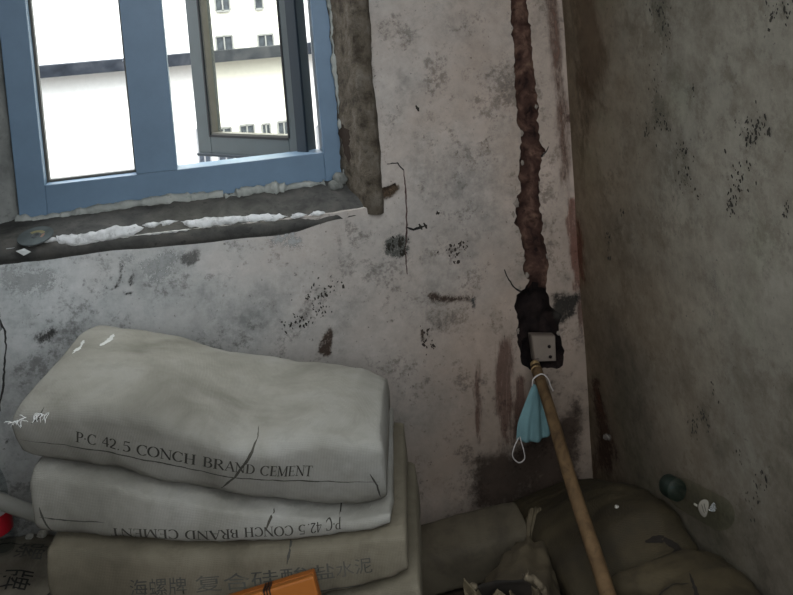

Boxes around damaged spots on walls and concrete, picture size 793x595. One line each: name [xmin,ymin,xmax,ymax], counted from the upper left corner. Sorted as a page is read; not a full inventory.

damp [734,100,771,147]
crack [390,162,424,274]
damp [726,160,757,217]
damp [281,275,345,334]
crack [0,319,8,411]
damp [318,329,333,357]